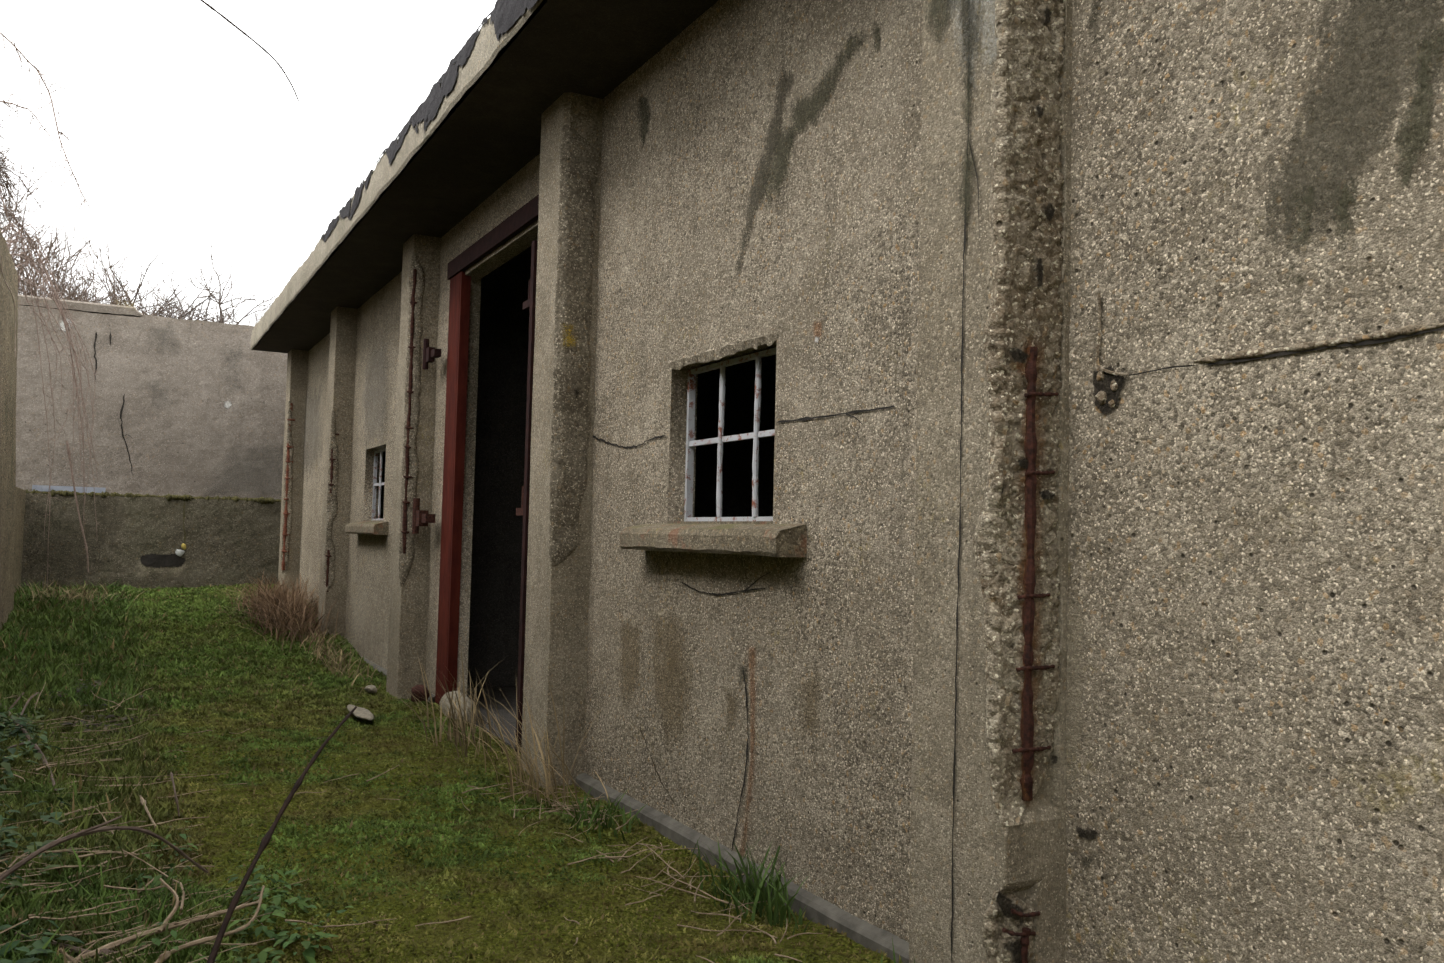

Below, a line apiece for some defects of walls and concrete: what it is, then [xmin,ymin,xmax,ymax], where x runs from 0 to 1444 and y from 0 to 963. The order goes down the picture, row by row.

peeling [321,0,537,242]
water stain [761,22,883,206]
water stain [1265,0,1444,283]
spalling [972,0,1066,826]
crack [1120,323,1444,377]
spalling [982,889,1040,963]